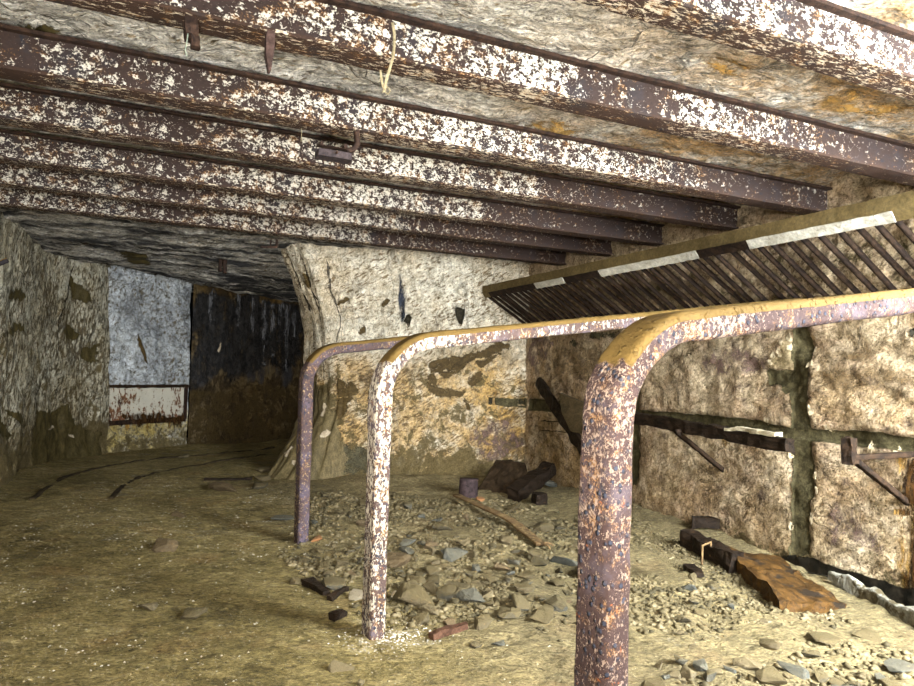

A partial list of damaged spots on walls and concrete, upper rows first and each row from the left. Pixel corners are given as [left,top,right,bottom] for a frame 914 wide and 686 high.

leakage [236,294,297,365]
corrosion [109,412,184,431]